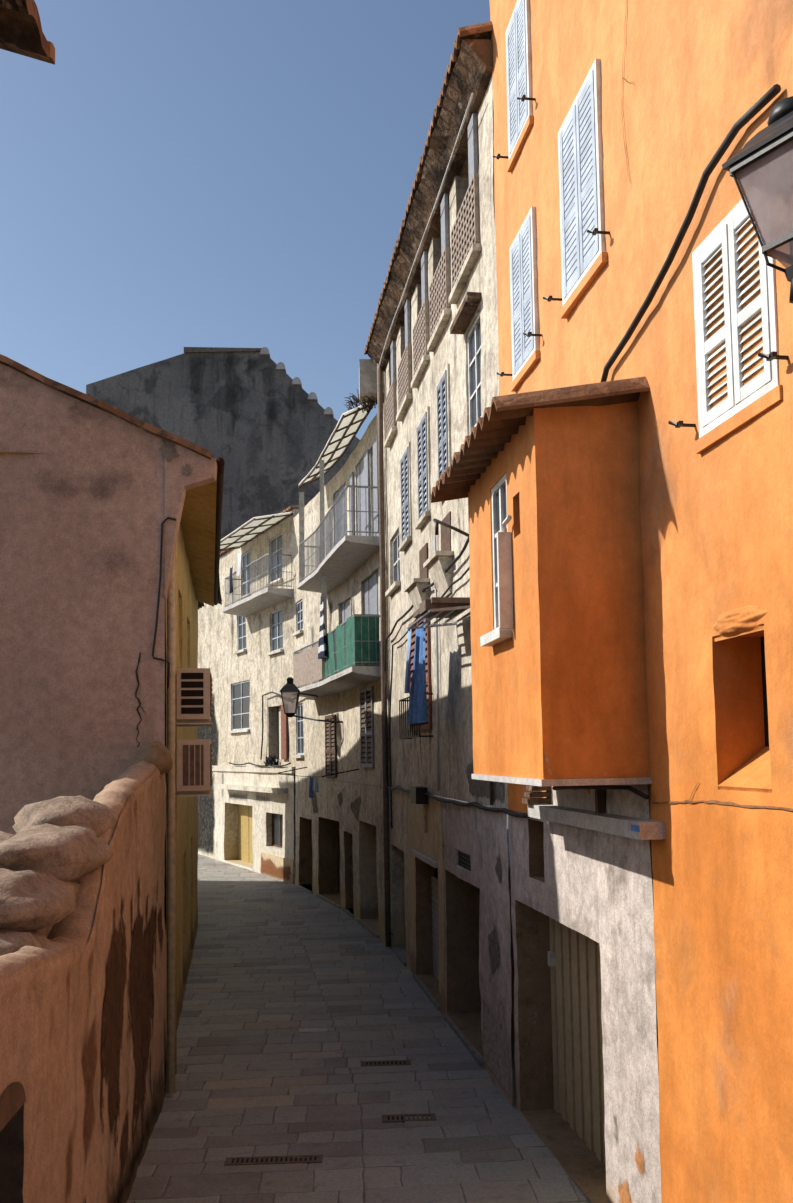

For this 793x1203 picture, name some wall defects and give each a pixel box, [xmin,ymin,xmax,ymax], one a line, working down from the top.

flaking render [635,1143,644,1173]
flaking render [618,1181,631,1203]